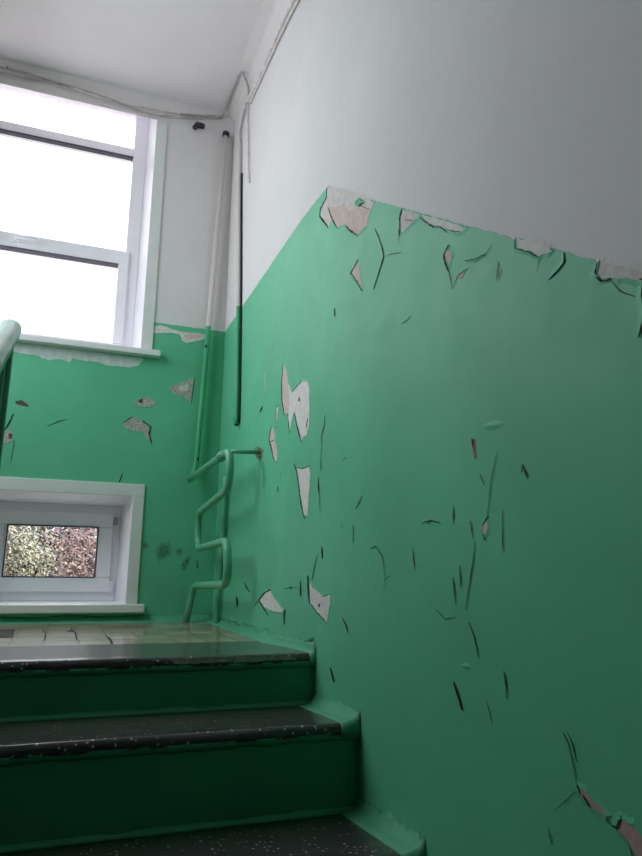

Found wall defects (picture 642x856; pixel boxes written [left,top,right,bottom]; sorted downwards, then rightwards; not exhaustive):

peeling [319,183,376,237]
peeling [396,206,469,288]
peeling [589,255,642,297]
peeling [153,324,207,348]
peeling [120,395,158,445]
peeling [269,362,311,463]
peeling [294,465,312,519]
crack [421,453,503,655]
peeling [255,588,285,624]
peeling [307,557,332,624]
crack [451,682,463,710]
peeling [556,732,642,856]